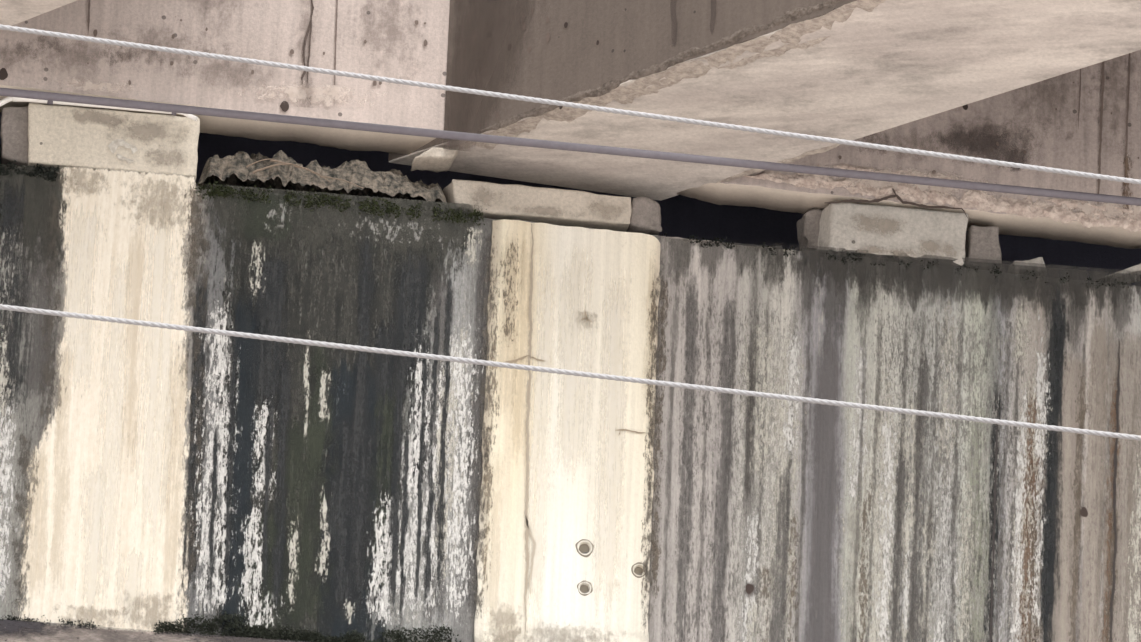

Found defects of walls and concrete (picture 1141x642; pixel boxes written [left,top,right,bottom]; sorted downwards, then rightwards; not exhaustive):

crack [301,0,314,104]
spalling [411,0,885,172]
leakage [0,110,519,642]
leakage [641,271,672,636]
leakage [676,285,699,642]
leakage [711,275,1090,642]
leakage [1101,368,1141,642]